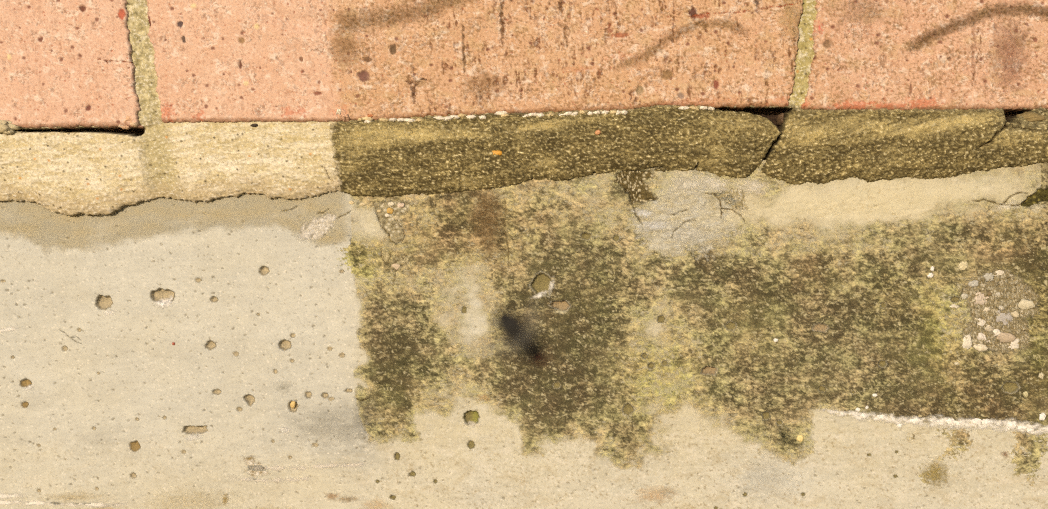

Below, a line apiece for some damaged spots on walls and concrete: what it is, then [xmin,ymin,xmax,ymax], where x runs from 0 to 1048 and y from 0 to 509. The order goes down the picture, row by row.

leakage [498,360,658,469]
leakage [726,393,1048,485]